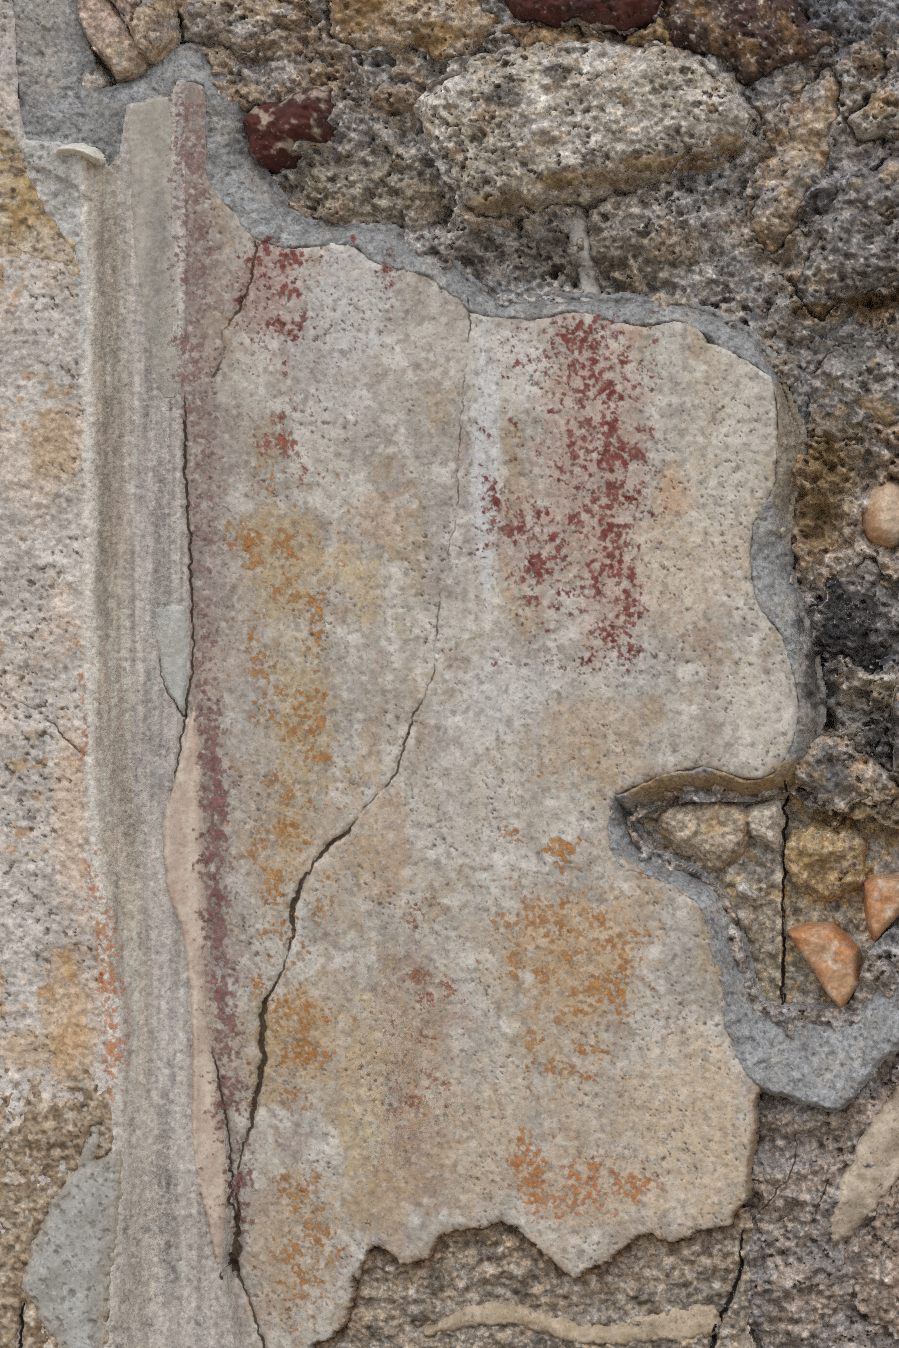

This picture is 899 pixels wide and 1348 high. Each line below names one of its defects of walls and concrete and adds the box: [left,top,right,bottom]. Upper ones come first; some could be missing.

crack [160,395,195,790]
peeling [166,87,358,1244]
peeling [475,311,665,675]
water stain [796,579,899,724]
water stain [866,736,899,759]
crack [211,670,435,1348]
peeling [381,1068,461,1116]
peeling [392,961,465,1062]
peeling [479,830,660,1102]
spalling [633,768,899,1005]
spalling [266,1127,756,1348]